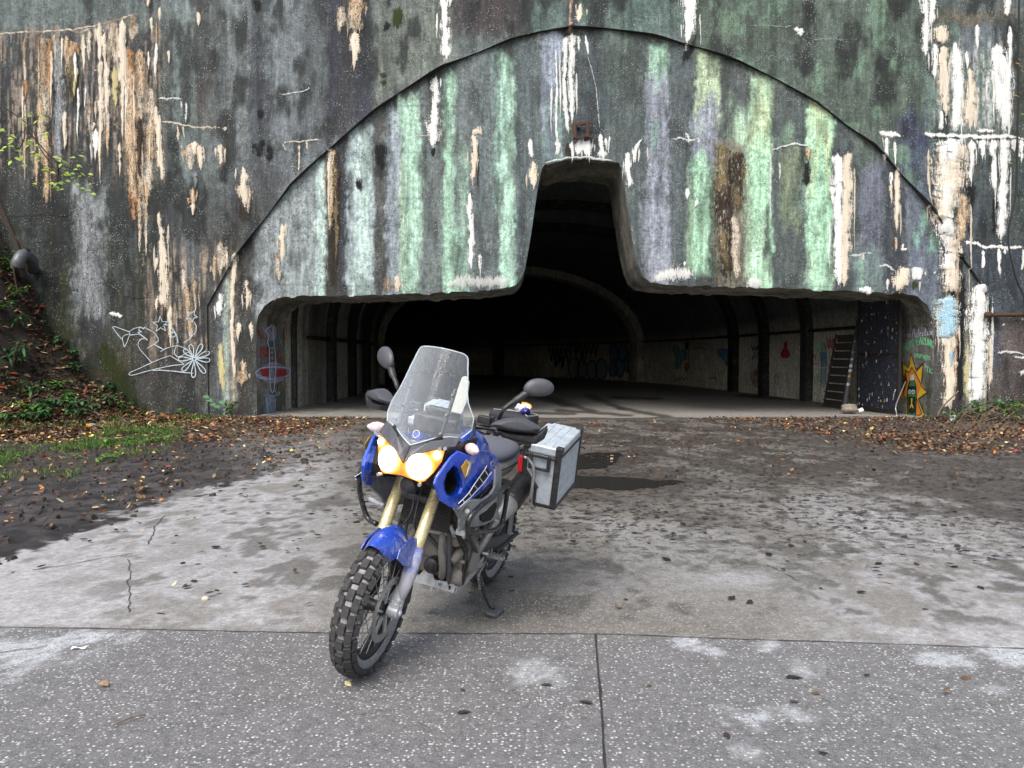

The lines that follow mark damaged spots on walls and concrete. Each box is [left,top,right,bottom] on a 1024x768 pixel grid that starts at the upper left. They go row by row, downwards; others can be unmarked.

damp [424,76,443,156]
damp [447,190,513,289]
corrosion [708,145,751,289]
damp [828,153,857,288]
peeling [927,295,961,339]